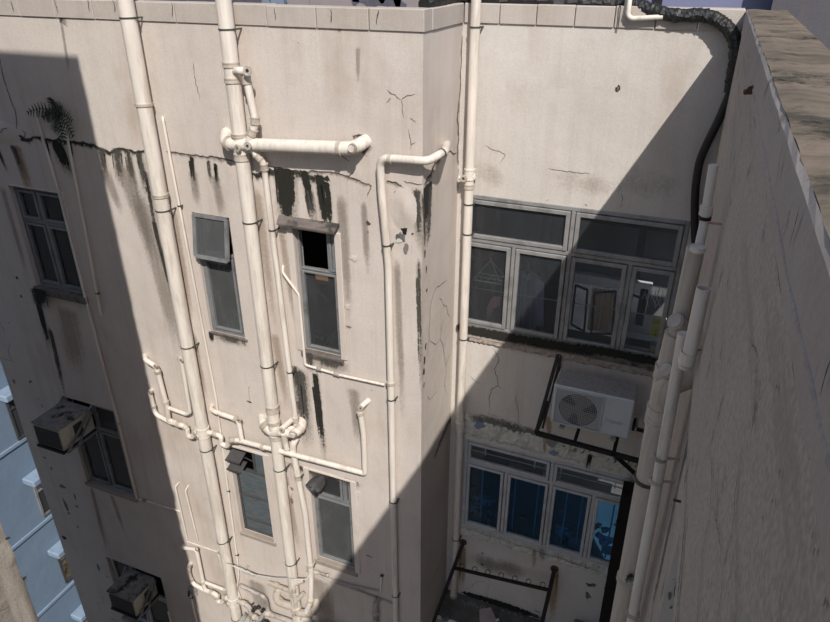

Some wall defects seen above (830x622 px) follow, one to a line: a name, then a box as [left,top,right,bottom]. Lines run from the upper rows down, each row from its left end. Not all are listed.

crack [0,61,144,155]
crack [252,36,463,195]
damp [11,145,26,181]
damp [46,141,72,174]
damp [99,147,168,282]
crack [166,151,235,164]
damp [274,167,332,223]
damp [414,181,432,245]
damp [292,353,342,445]